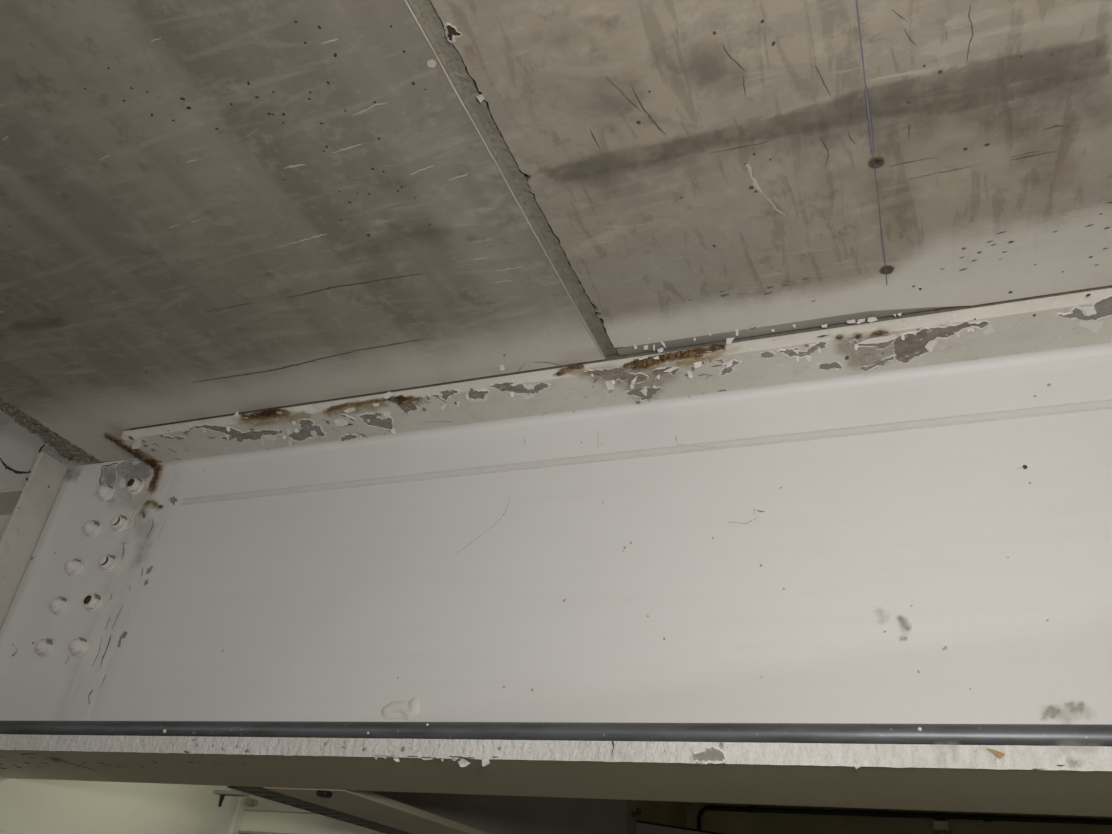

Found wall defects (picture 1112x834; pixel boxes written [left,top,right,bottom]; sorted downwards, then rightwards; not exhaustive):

peeling [1056,294,1112,333]
rust [622,344,725,369]
peeling [759,318,994,377]
peeling [422,354,551,412]
peeling [583,358,742,404]
rust [233,391,422,425]
rust [105,433,163,517]